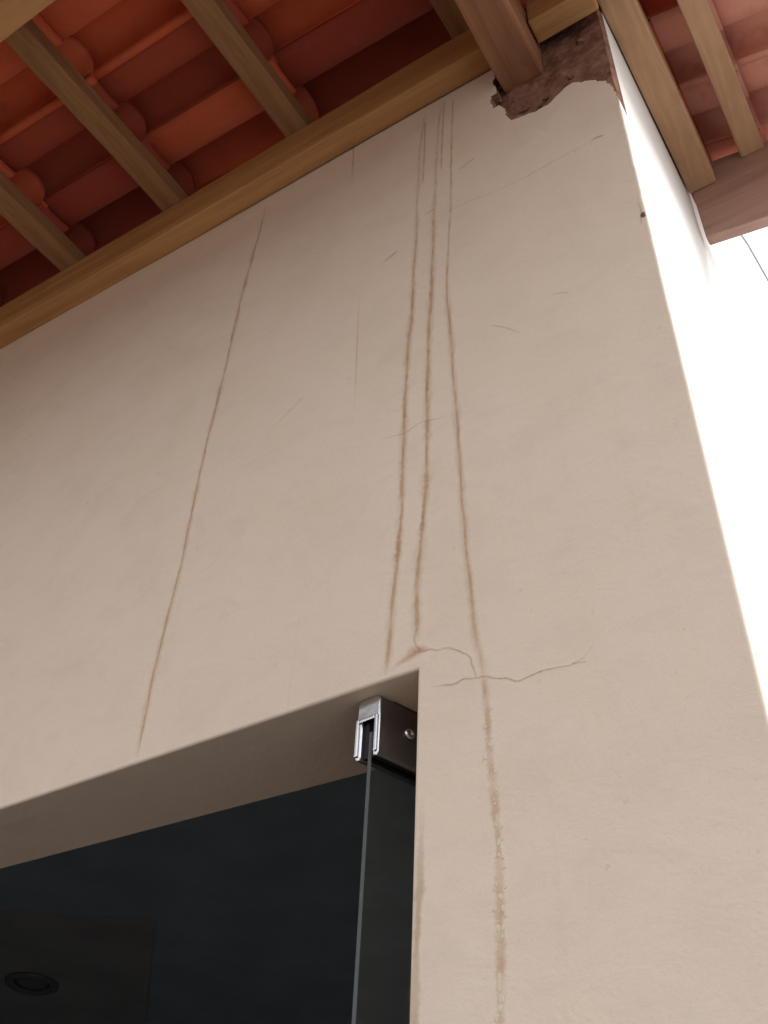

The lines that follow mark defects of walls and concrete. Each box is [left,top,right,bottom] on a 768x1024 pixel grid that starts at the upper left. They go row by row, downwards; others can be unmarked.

flaking render [498,4,626,120]